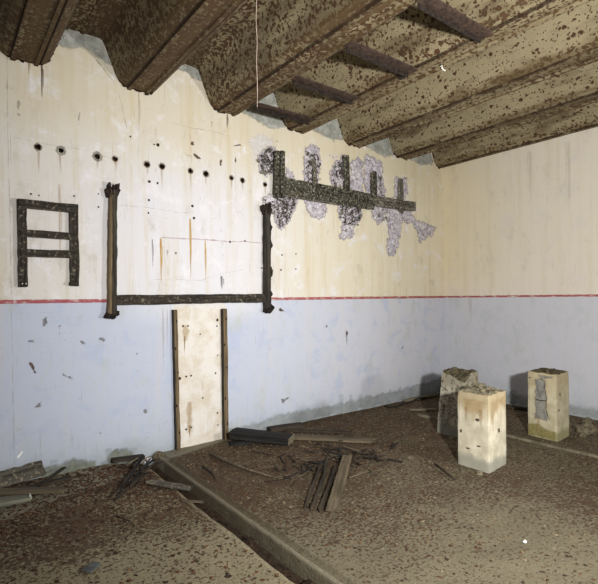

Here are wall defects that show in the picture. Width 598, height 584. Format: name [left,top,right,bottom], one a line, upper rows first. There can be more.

flaking render [302,144,321,183]
flaking render [350,138,409,199]
flaking render [303,199,328,219]
flaking render [386,208,437,256]
leakage [243,378,441,430]